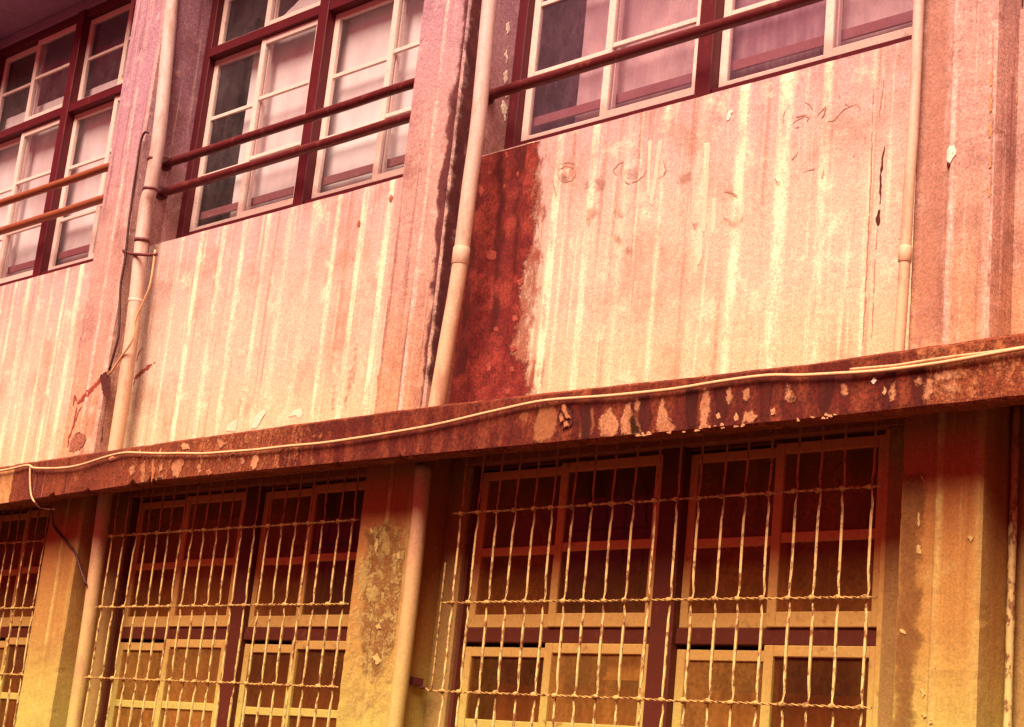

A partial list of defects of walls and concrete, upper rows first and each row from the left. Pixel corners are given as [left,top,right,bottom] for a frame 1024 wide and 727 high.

peeling [947,145,957,168]
water stain [274,0,936,467]
crack [775,81,885,345]
spalling [69,432,86,452]
spalling [100,371,111,399]
peeling [519,374,757,442]
peeling [871,378,896,402]
peeling [343,525,405,720]